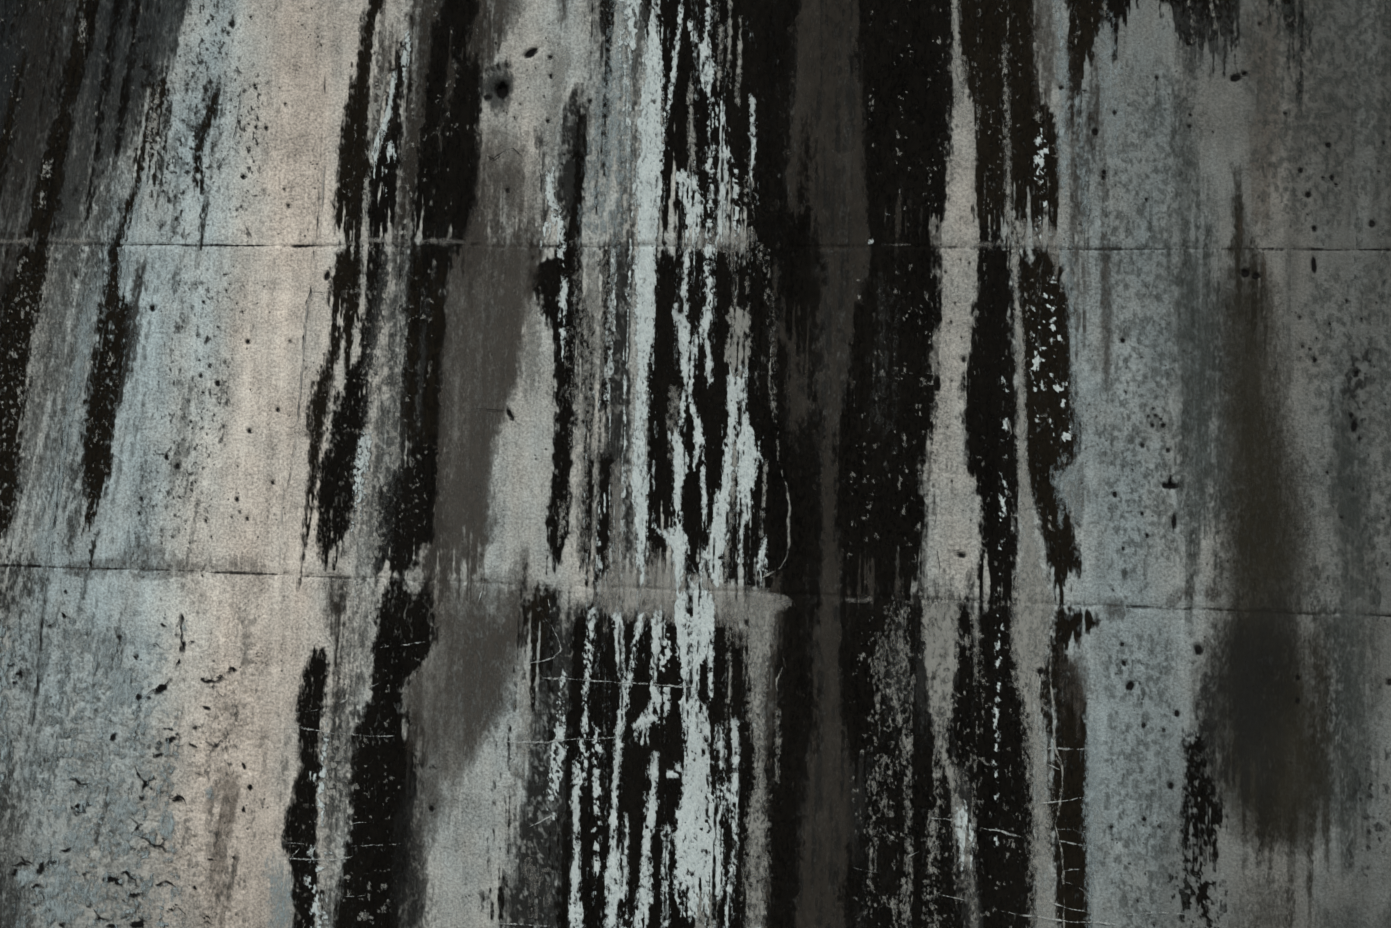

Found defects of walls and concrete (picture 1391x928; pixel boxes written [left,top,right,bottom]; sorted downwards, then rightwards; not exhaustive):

water stain [0,583,45,713]
water stain [0,751,49,828]
water stain [0,0,260,574]
water stain [265,0,1145,928]
water stain [1159,0,1240,78]
water stain [1152,173,1391,928]